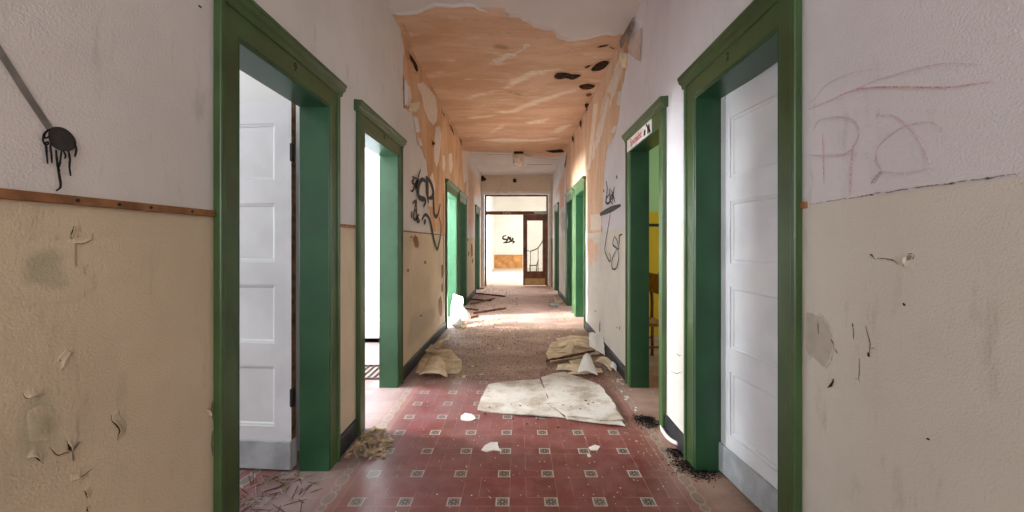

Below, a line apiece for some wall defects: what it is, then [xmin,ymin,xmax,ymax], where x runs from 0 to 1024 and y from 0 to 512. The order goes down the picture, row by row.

peeling [391,3,641,237]
peeling [27,439,92,512]